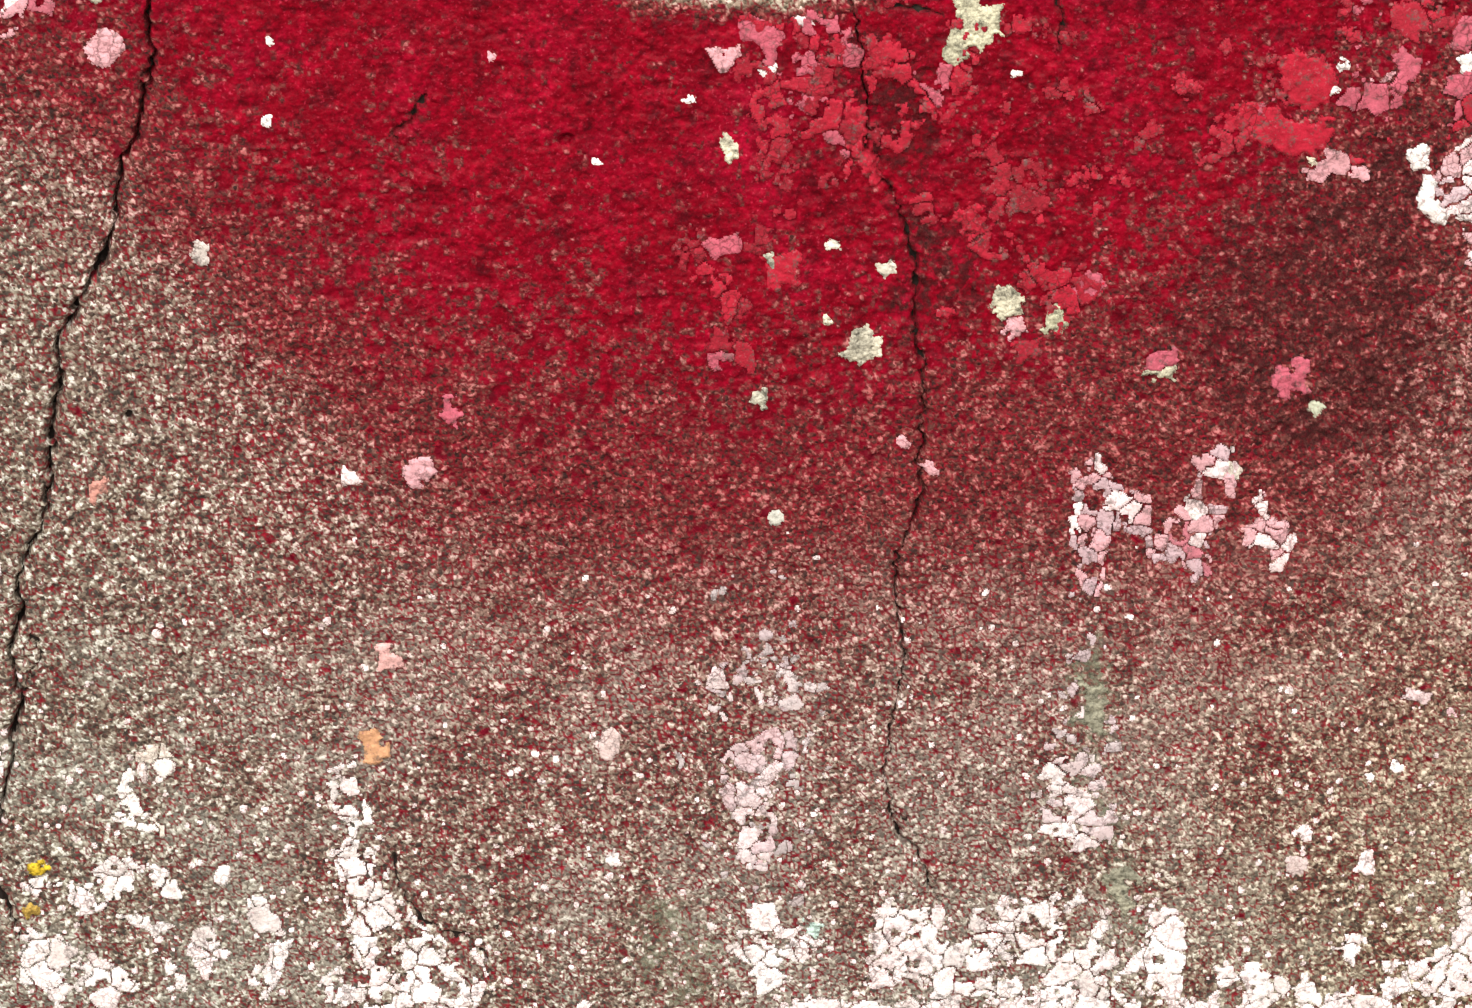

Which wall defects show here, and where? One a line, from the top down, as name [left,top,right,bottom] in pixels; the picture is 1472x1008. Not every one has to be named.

crack [852,4,869,146]
peeling [671,10,1079,374]
crack [893,3,938,13]
peeling [1329,0,1472,266]
crack [0,3,157,812]
crack [882,184,929,883]
peeling [1068,443,1297,600]
crack [0,886,21,934]
peeling [317,761,489,1008]
peeling [706,620,830,995]
peeling [1031,632,1122,852]
peeling [784,886,1472,1008]